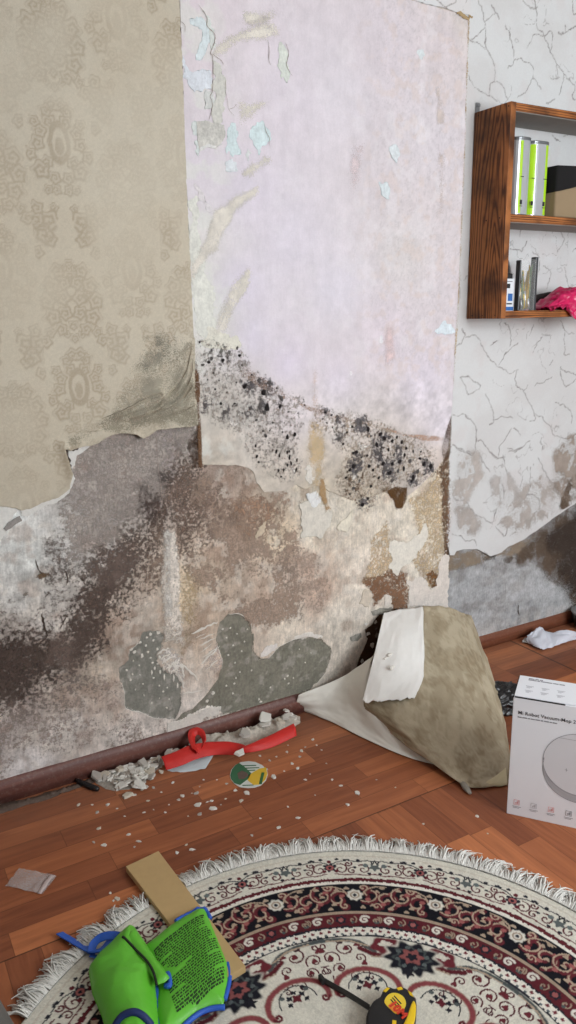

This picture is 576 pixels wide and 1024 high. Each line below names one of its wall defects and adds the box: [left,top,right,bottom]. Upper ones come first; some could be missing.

peeling [182,10,271,172]
peeling [187,183,242,351]
peeling [3,516,22,531]
leakage [0,332,576,779]
peeling [299,465,353,539]
peeling [350,523,450,667]
flaking render [119,613,332,732]